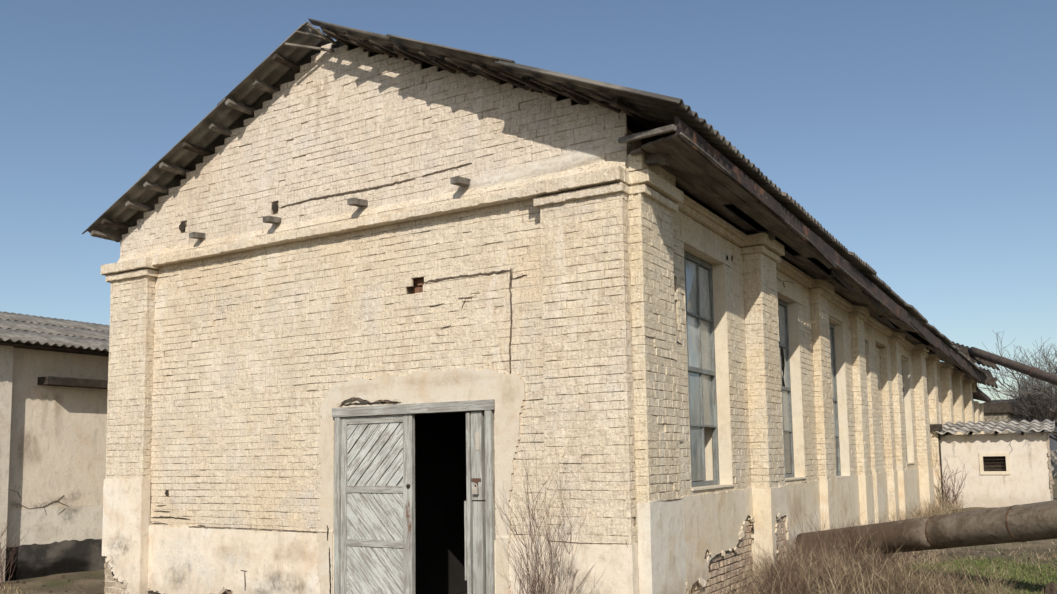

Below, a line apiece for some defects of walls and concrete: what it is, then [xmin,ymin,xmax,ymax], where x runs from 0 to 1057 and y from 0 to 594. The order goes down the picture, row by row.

crack [279,163,471,208]
crack [425,268,524,374]
flaking render [337,395,401,407]
crack [9,489,67,513]
flaking render [685,515,755,594]
flaking render [775,513,787,570]